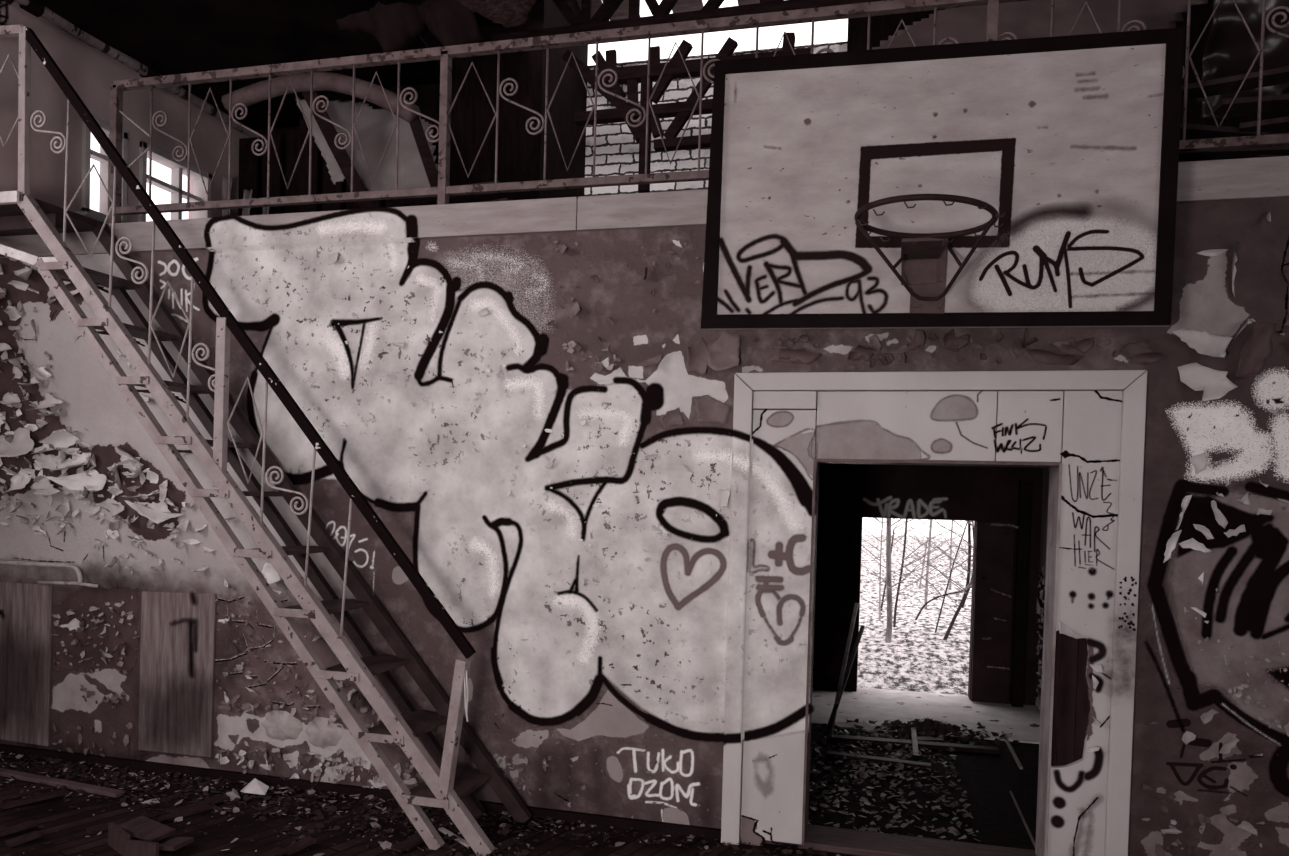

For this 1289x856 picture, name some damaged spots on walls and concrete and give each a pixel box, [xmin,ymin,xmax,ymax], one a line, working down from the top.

spalling [557,240,1289,428]
peeling [0,254,215,757]
peeling [262,562,282,594]
peeling [1163,478,1274,563]
spalling [146,680,423,789]
spalling [1140,709,1289,856]
peeling [1184,607,1289,736]